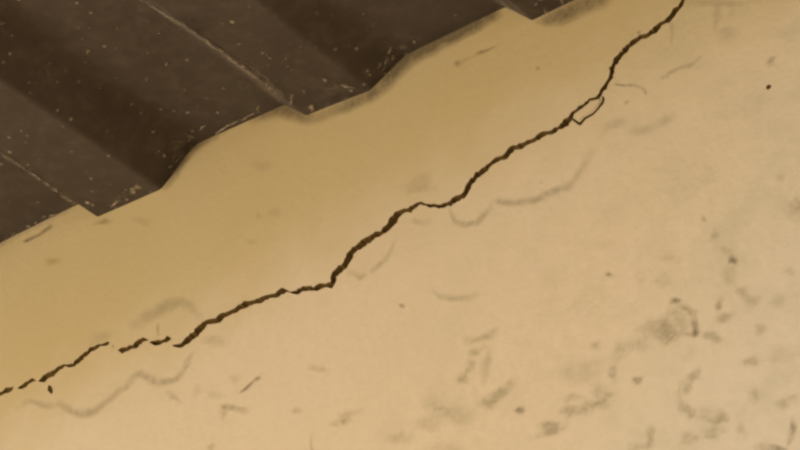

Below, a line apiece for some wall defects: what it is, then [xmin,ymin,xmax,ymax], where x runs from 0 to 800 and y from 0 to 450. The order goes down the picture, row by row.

crack [0,0,684,396]